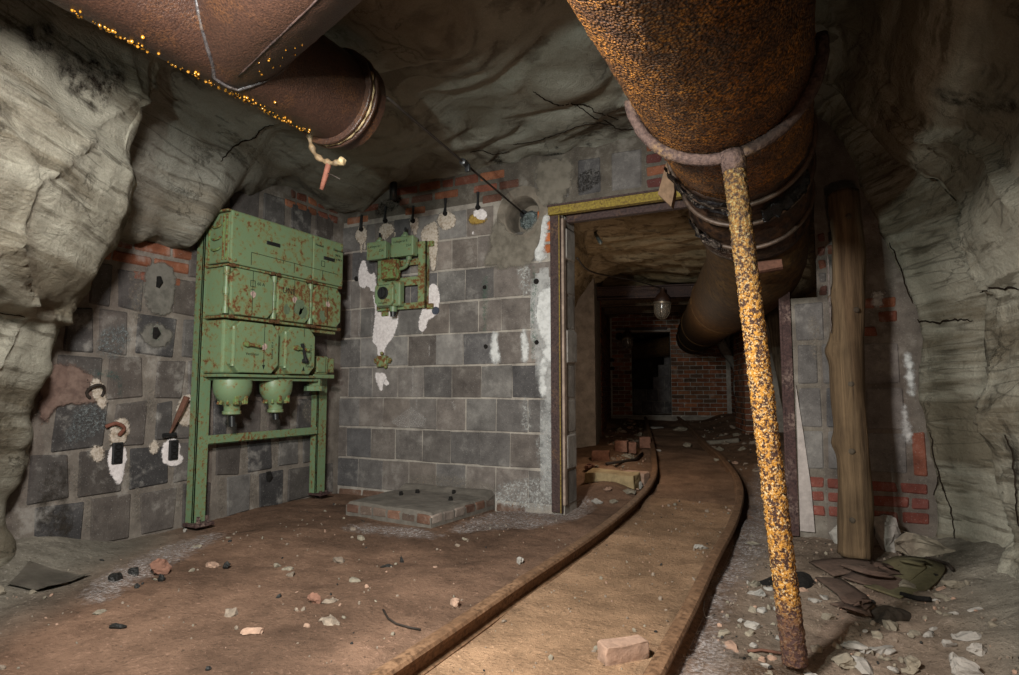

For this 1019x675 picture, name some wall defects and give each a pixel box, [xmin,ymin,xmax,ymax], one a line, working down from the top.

crack [979,285,1019,293]
peeling [176,394,191,427]
damp [409,267,589,531]
peeling [90,418,130,484]
peeling [149,438,183,466]
crack [929,432,955,539]
crack [1004,435,1019,527]